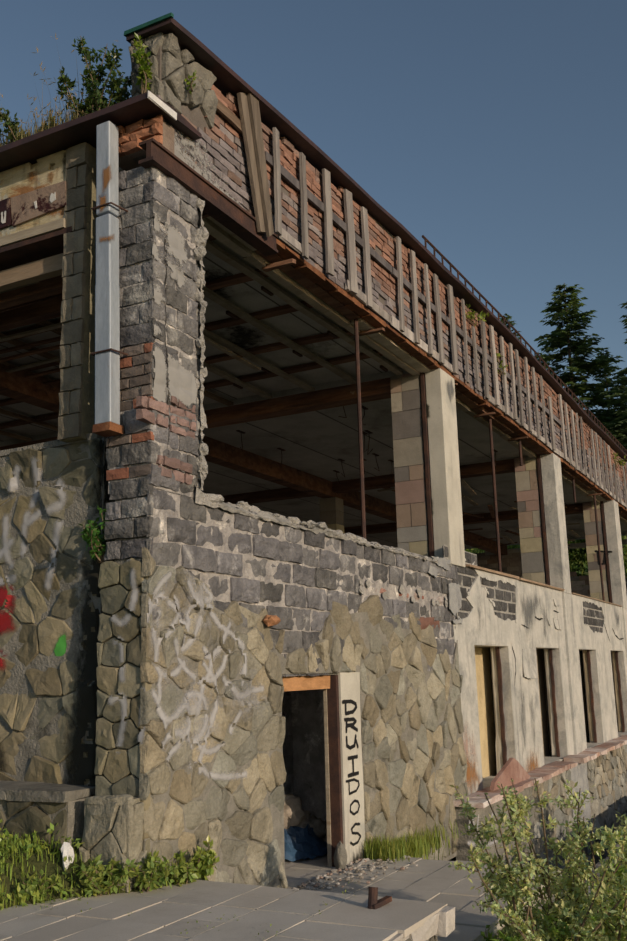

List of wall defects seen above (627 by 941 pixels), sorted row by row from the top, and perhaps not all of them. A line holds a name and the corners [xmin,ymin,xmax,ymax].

spalling [136,198,209,491]
spalling [359,545,517,630]
spalling [583,601,605,633]
rust [466,761,478,784]